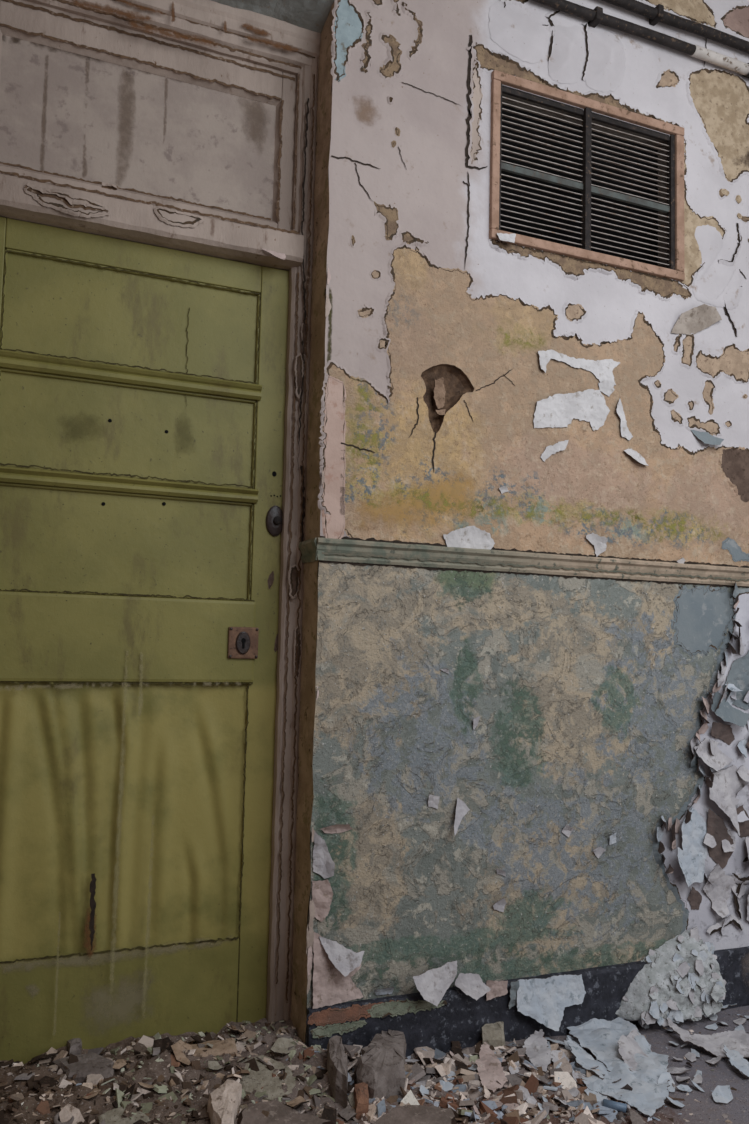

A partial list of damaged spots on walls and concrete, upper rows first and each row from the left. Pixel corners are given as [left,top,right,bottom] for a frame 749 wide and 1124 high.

peeling [331,0,425,84]
crack [297,98,407,564]
peeling [318,42,749,568]
crack [464,370,515,423]
crack [410,397,436,472]
peeling [428,794,439,809]
peeling [454,798,470,836]
peeling [593,833,616,859]
peeling [615,582,749,1029]
peeling [306,824,491,1041]
peeling [508,974,586,1031]